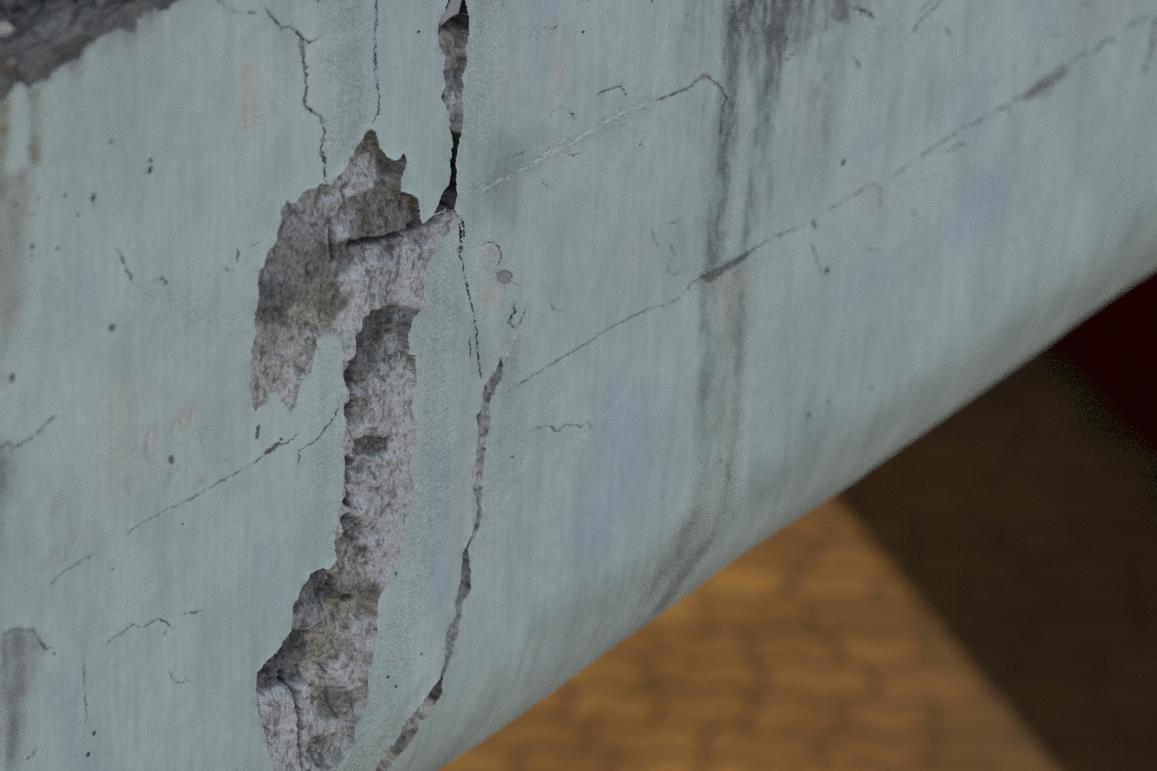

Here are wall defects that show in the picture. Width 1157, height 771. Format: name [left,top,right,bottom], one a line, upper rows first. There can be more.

crack [217,0,327,184]
crack [372,0,382,125]
leakage [719,0,814,178]
flaking render [249,129,459,771]
crack [375,0,1157,771]